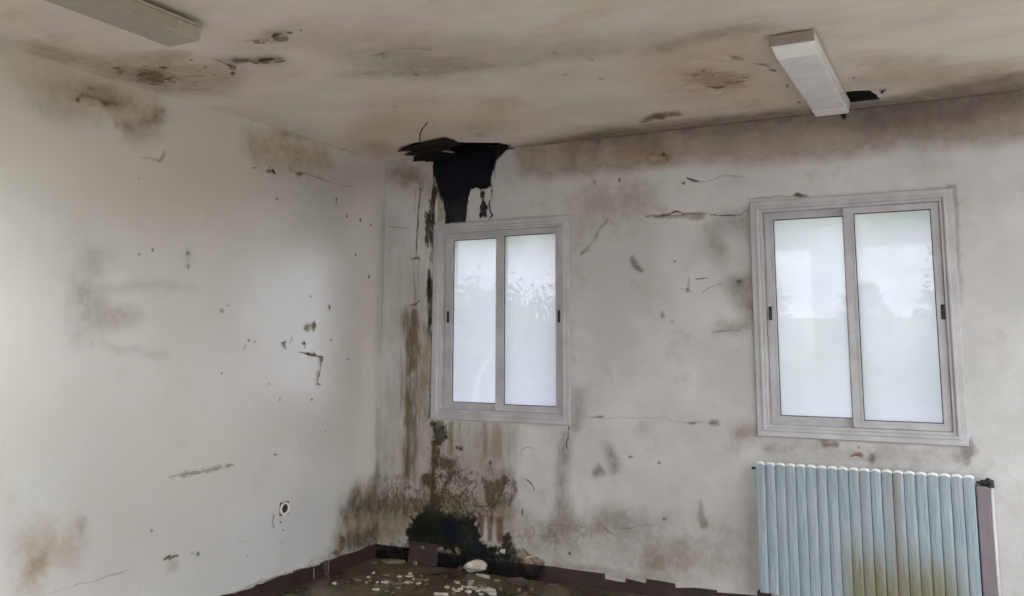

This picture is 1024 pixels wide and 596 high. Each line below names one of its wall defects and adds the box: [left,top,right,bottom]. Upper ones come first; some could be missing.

crack [646,210,735,218]
water stain [334,78,1024,562]
crack [301,342,323,385]